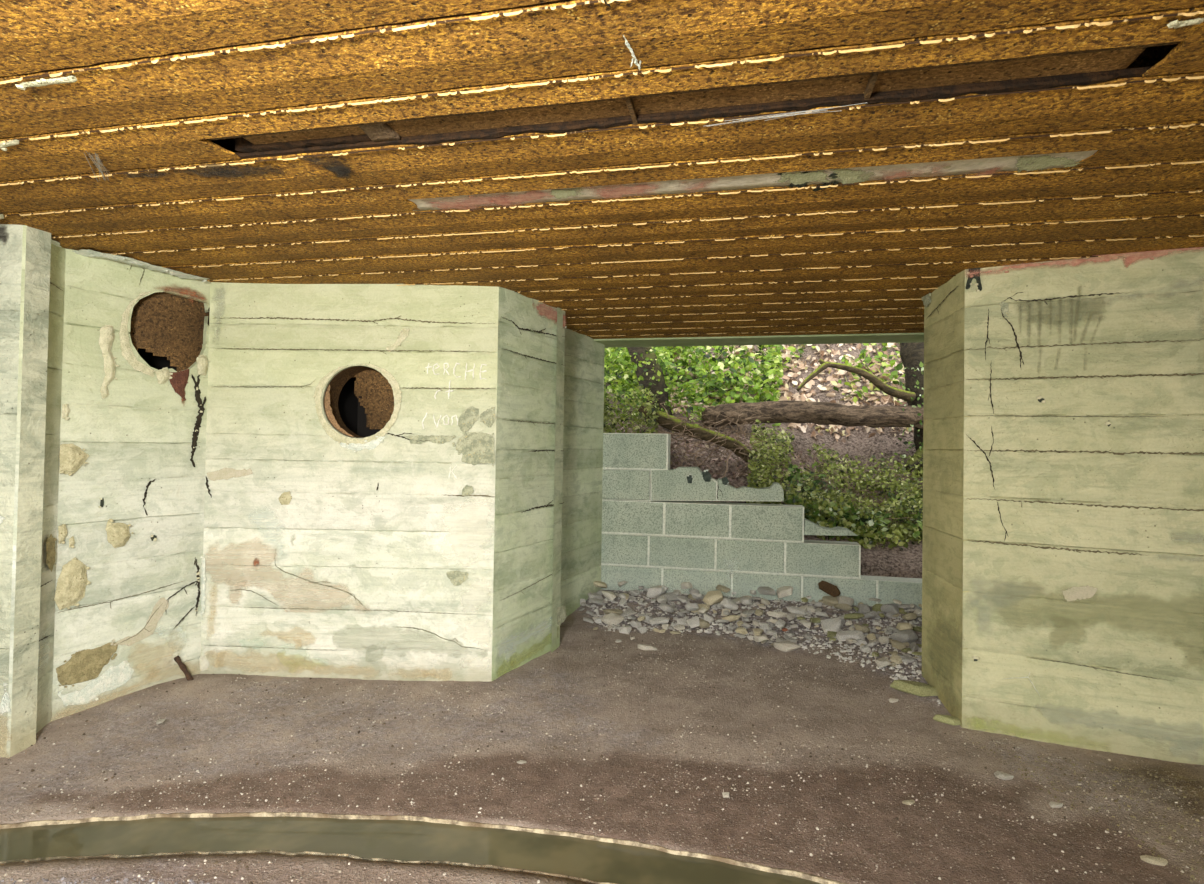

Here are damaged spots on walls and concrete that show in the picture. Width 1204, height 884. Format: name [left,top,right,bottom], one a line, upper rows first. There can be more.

crack [623,35,641,70]
crack [213,316,565,365]
rust [169,369,189,403]
crack [403,385,494,393]
crack [190,375,310,498]
crack [507,420,563,454]
crack [966,292,1204,555]
crack [142,479,155,516]
crack [39,549,552,650]
spalling [56,597,169,706]
crack [206,644,343,652]